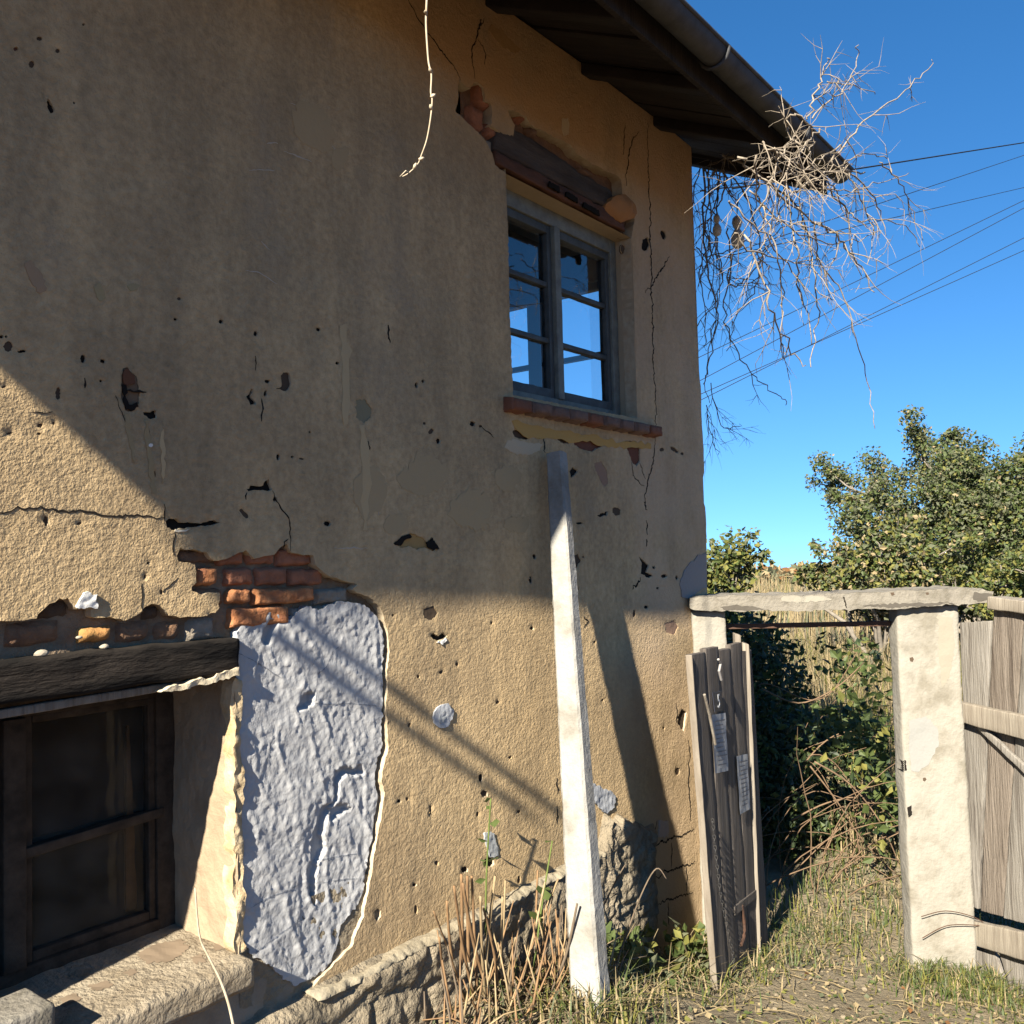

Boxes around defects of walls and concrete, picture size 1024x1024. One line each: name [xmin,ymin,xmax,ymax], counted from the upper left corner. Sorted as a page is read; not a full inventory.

crack [408,0,486,77]
crack [623,123,669,547]
flaking render [121,367,155,419]
crack [0,504,176,554]
crack [273,492,291,551]
flaking render [394,533,439,551]
flaking render [3,591,98,647]
flaking render [76,549,346,643]
crack [655,708,694,923]